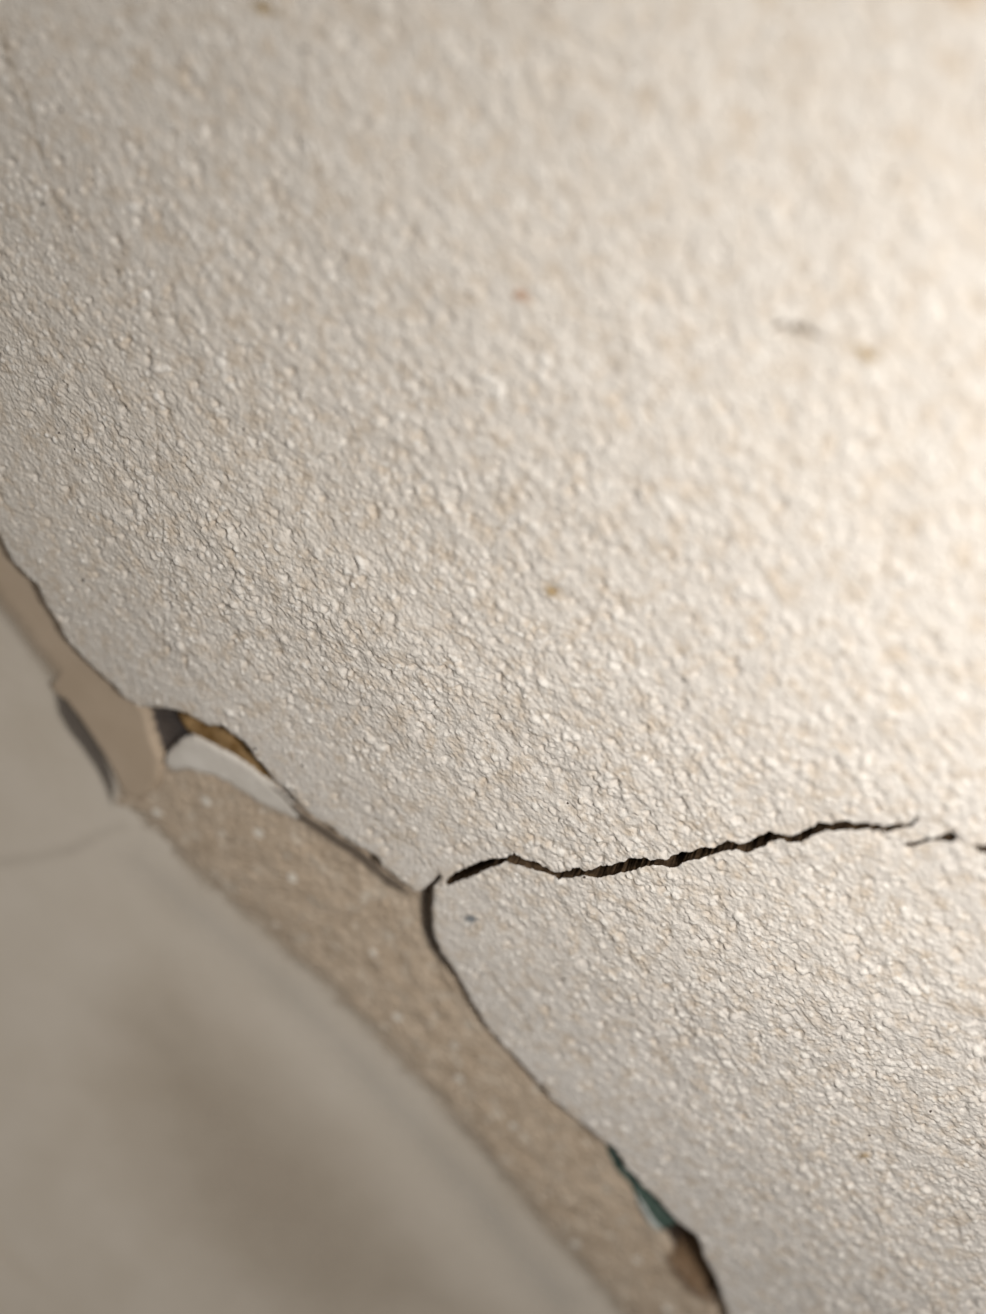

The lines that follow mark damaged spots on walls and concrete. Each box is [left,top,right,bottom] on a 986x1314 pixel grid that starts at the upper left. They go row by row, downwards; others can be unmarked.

flaking render [150,707,299,820]
crack [273,788,986,972]
flaking render [605,1143,719,1300]